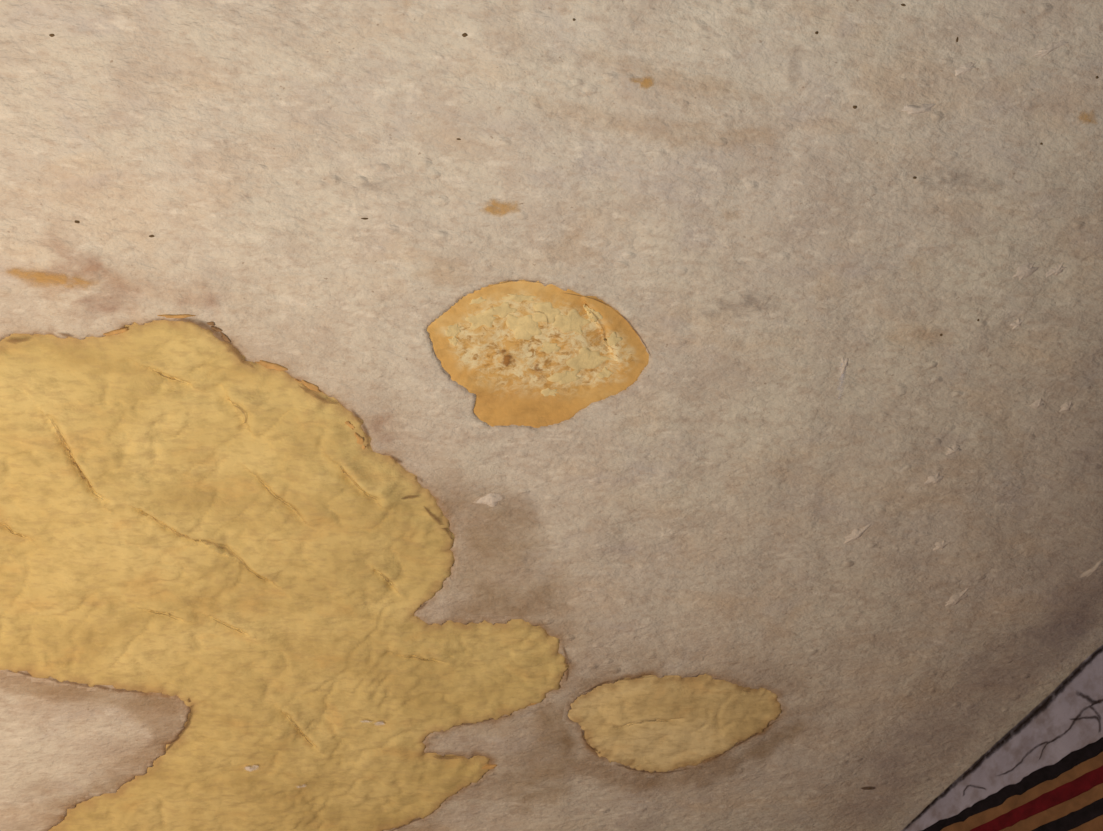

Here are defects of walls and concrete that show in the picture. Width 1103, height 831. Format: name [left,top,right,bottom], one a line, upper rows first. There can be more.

spalling [427,280,650,428]
spalling [0,314,569,831]
spalling [568,673,782,773]